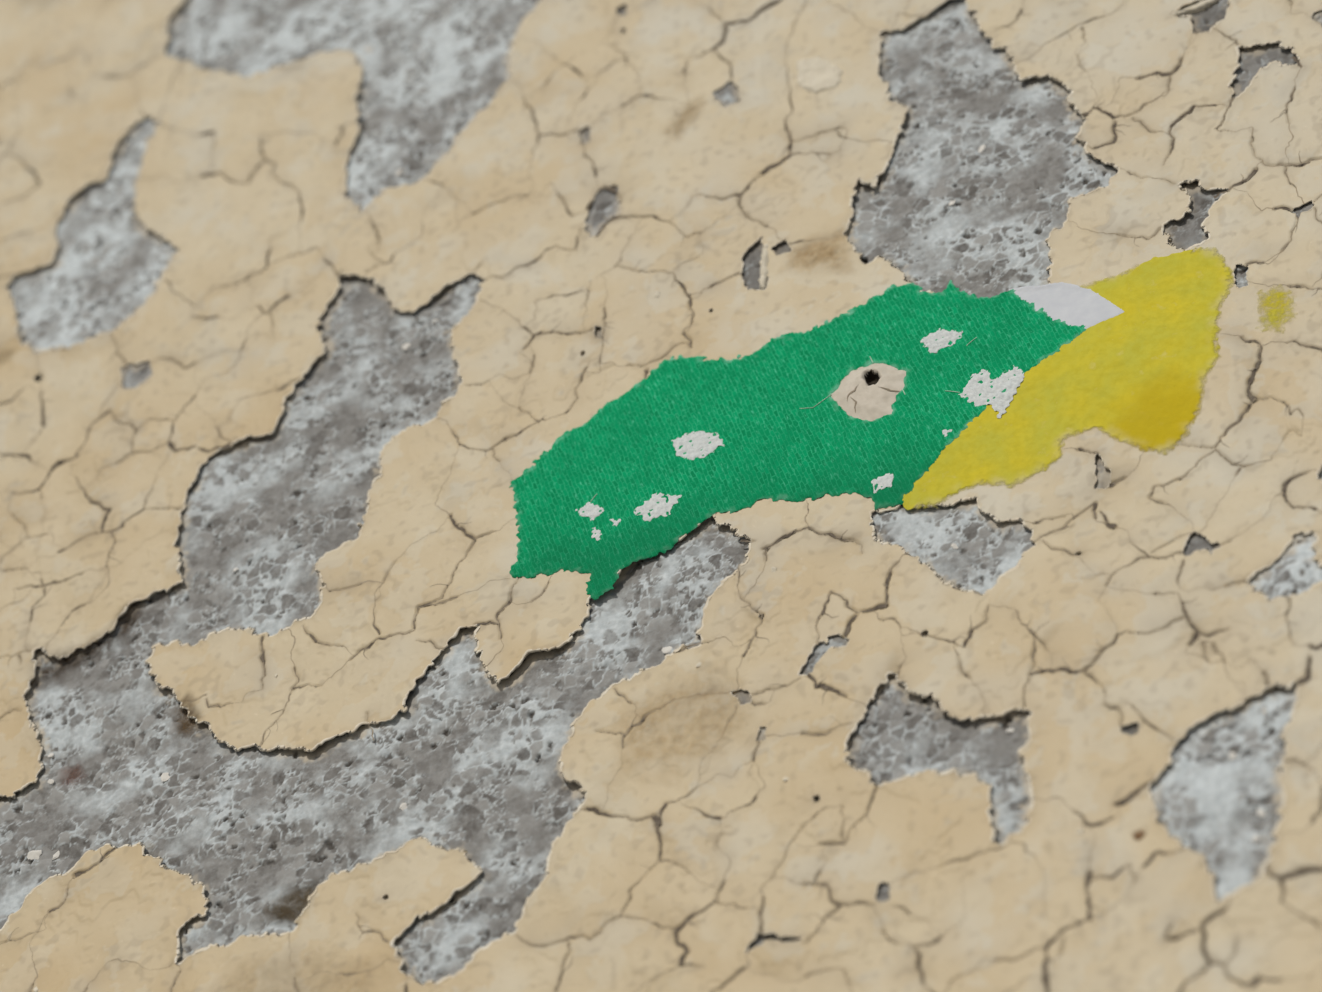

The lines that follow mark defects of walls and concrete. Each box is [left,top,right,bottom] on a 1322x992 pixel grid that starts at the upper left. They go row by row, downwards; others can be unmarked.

peeling [163,0,543,212]
peeling [843,0,1120,298]
crack [991,0,1032,32]
crack [1014,2,1322,294]
crack [0,0,916,746]
peeling [0,273,754,985]
crack [516,334,1322,992]
peeling [843,671,1034,845]
peeling [869,496,1036,596]
peeling [1148,680,1300,902]
crack [84,957,181,992]
crack [288,913,409,992]